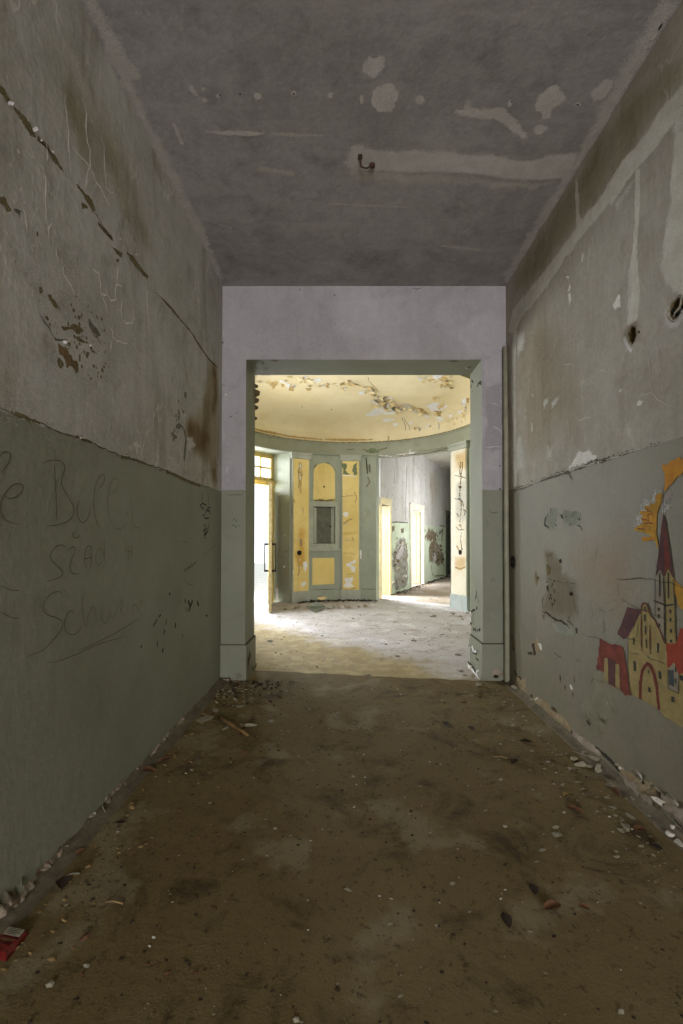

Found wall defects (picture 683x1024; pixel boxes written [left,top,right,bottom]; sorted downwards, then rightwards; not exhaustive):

crack [22,93,113,292]
peeling [0,85,217,368]
peeling [38,287,107,387]
crack [94,270,149,351]
spalling [623,321,640,353]
spalling [662,295,683,328]
peeling [253,360,481,432]
peeling [499,435,682,491]
peeling [298,447,447,591]
peeling [425,462,467,577]
flaking render [491,668,683,829]